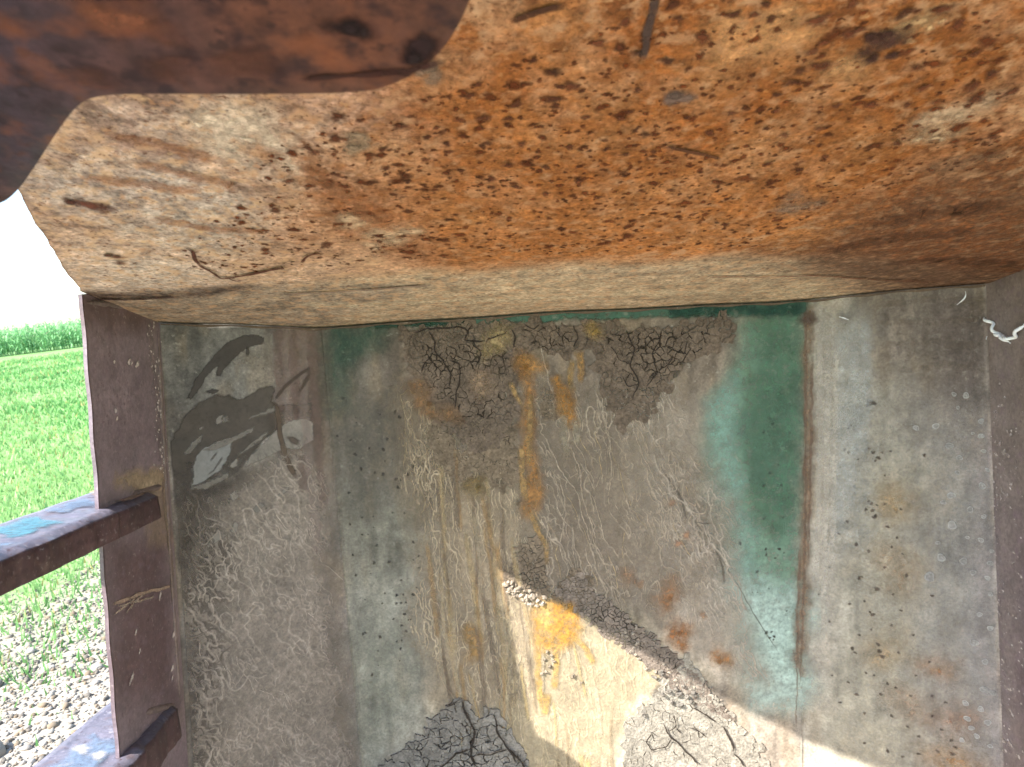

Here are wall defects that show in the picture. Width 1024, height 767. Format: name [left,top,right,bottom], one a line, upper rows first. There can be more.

corrosion [323,19,372,40]
corrosion [402,35,437,65]
corrosion [714,8,813,68]
corrosion [830,18,945,74]
corrosion [915,96,993,141]
corrosion [64,199,114,213]
corrosion [288,164,423,254]
corrosion [88,287,244,300]
corrosion [511,355,549,558]
damp [533,388,646,624]
crack [676,491,738,585]
corrosion [531,602,595,714]